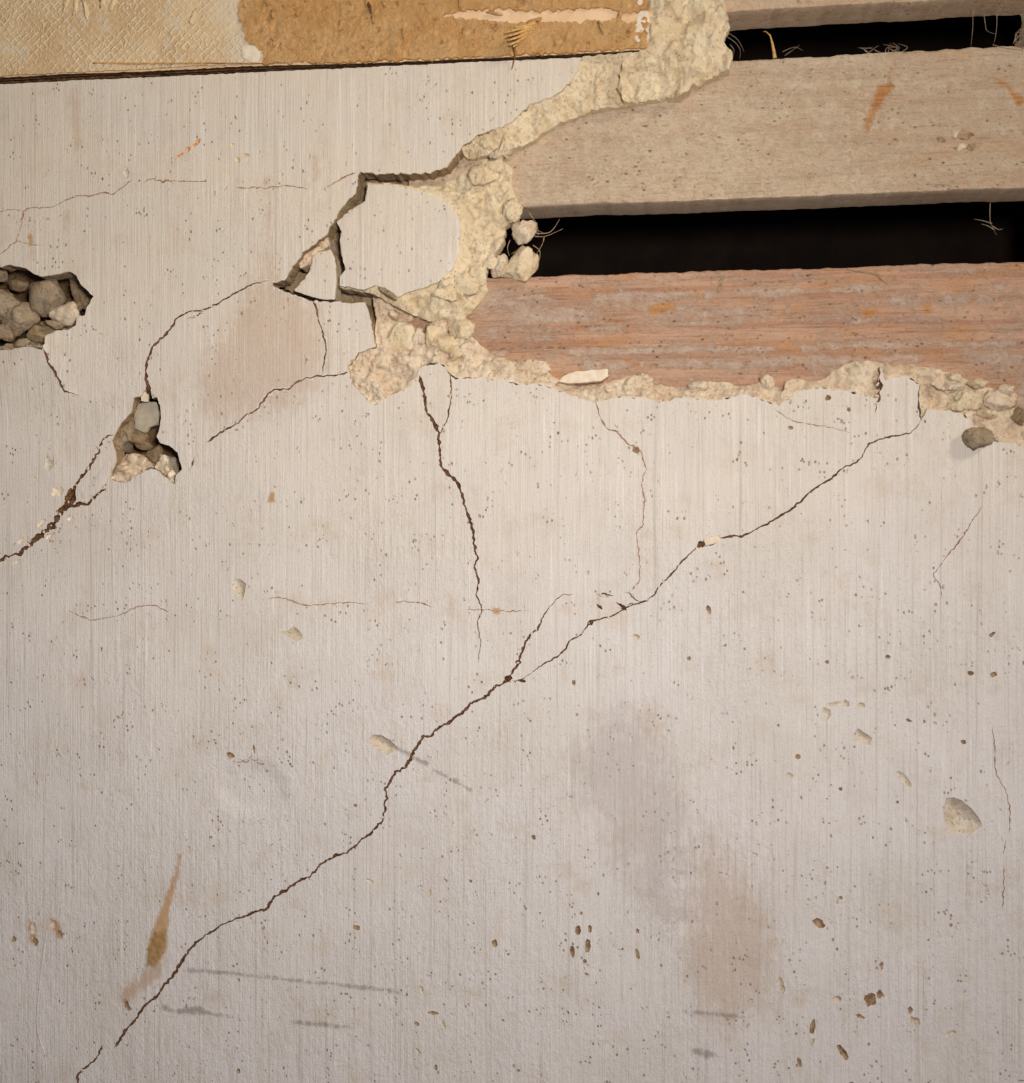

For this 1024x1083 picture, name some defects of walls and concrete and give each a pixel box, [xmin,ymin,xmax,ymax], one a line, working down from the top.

spalling [462,0,733,162]
spalling [0,268,93,350]
crack [0,435,111,565]
crack [43,349,77,397]
spalling [81,391,182,499]
crack [144,280,268,393]
crack [190,301,348,471]
spalling [285,269,322,302]
spalling [333,228,345,274]
spalling [340,290,1024,446]
crack [70,375,920,1083]
rust [125,867,179,1002]